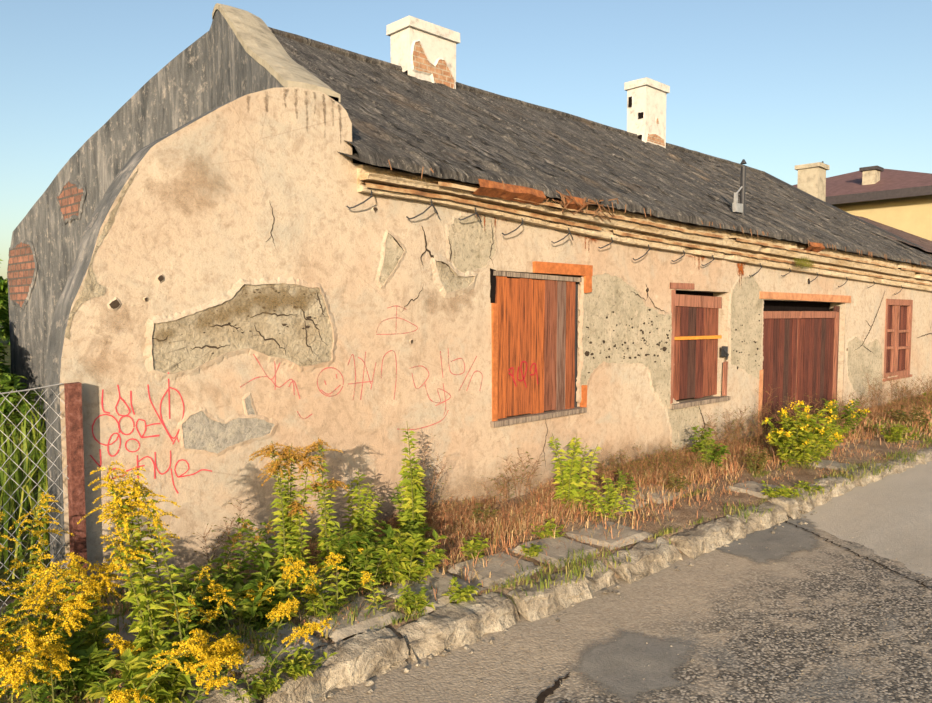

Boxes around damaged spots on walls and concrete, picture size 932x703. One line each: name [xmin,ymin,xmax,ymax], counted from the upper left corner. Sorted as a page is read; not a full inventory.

water stain [284,89,342,142]
spalling [374,229,407,289]
crack [420,227,454,275]
peeling [429,211,499,303]
spalling [143,276,338,381]
spalling [576,269,704,451]
spalling [727,271,764,382]
crack [854,292,885,353]
spalling [176,393,279,457]